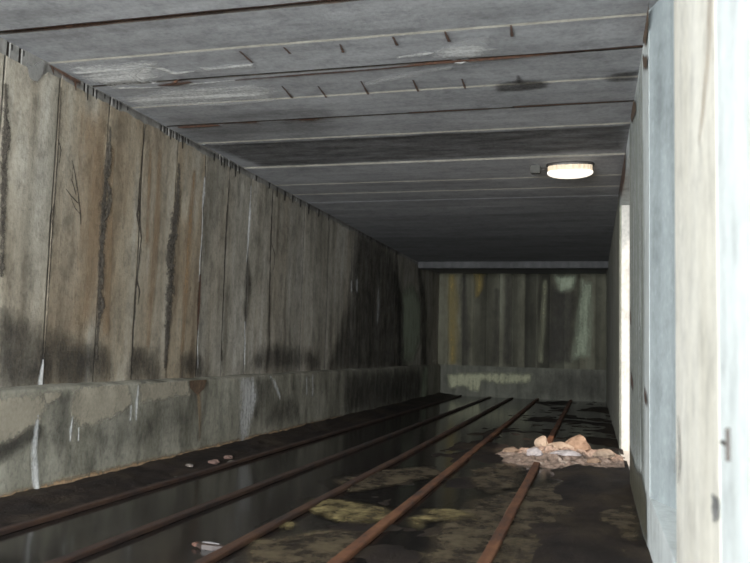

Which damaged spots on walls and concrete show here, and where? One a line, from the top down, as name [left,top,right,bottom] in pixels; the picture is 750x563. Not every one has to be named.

corrosion [240,45,643,80]
leakage [498,79,544,91]
crack [43,88,81,384]
crack [131,125,146,373]
leakage [329,232,405,370]
leakage [0,318,109,385]
leakage [448,373,531,391]
leakage [0,419,40,489]